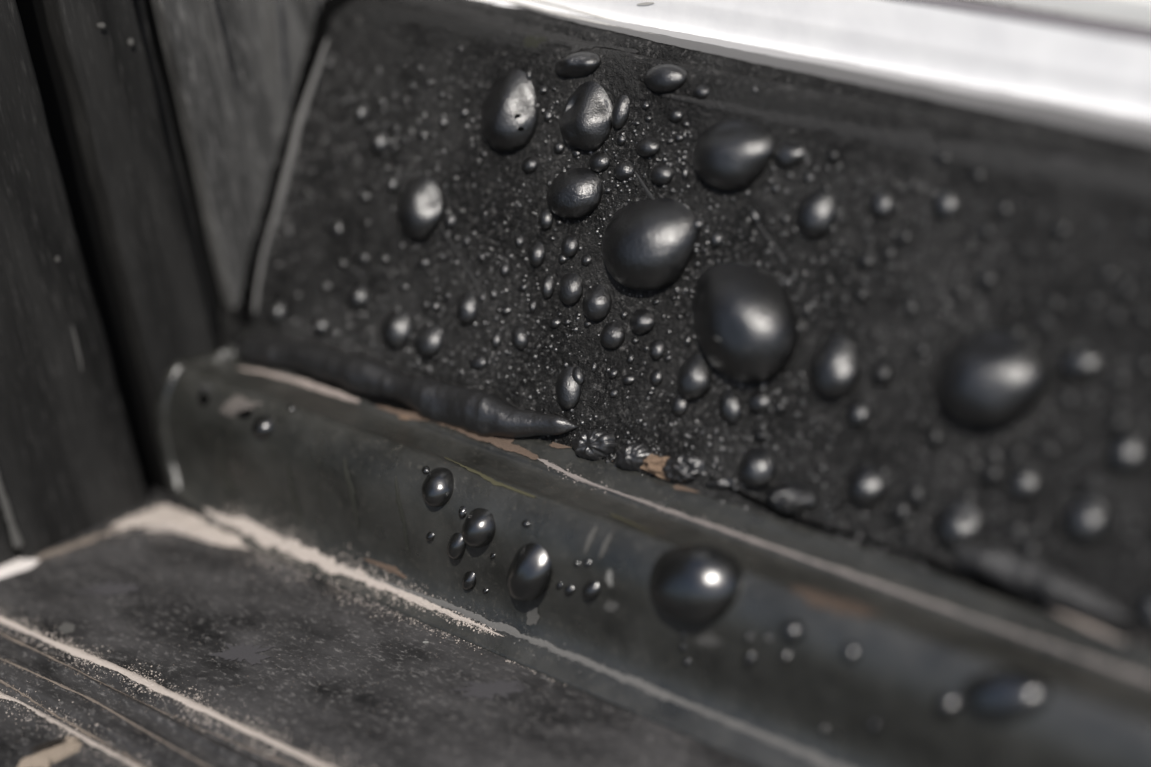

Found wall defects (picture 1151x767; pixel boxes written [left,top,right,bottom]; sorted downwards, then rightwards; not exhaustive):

peeling [662,453,705,484]
damp [584,526,619,612]
damp [526,606,540,625]